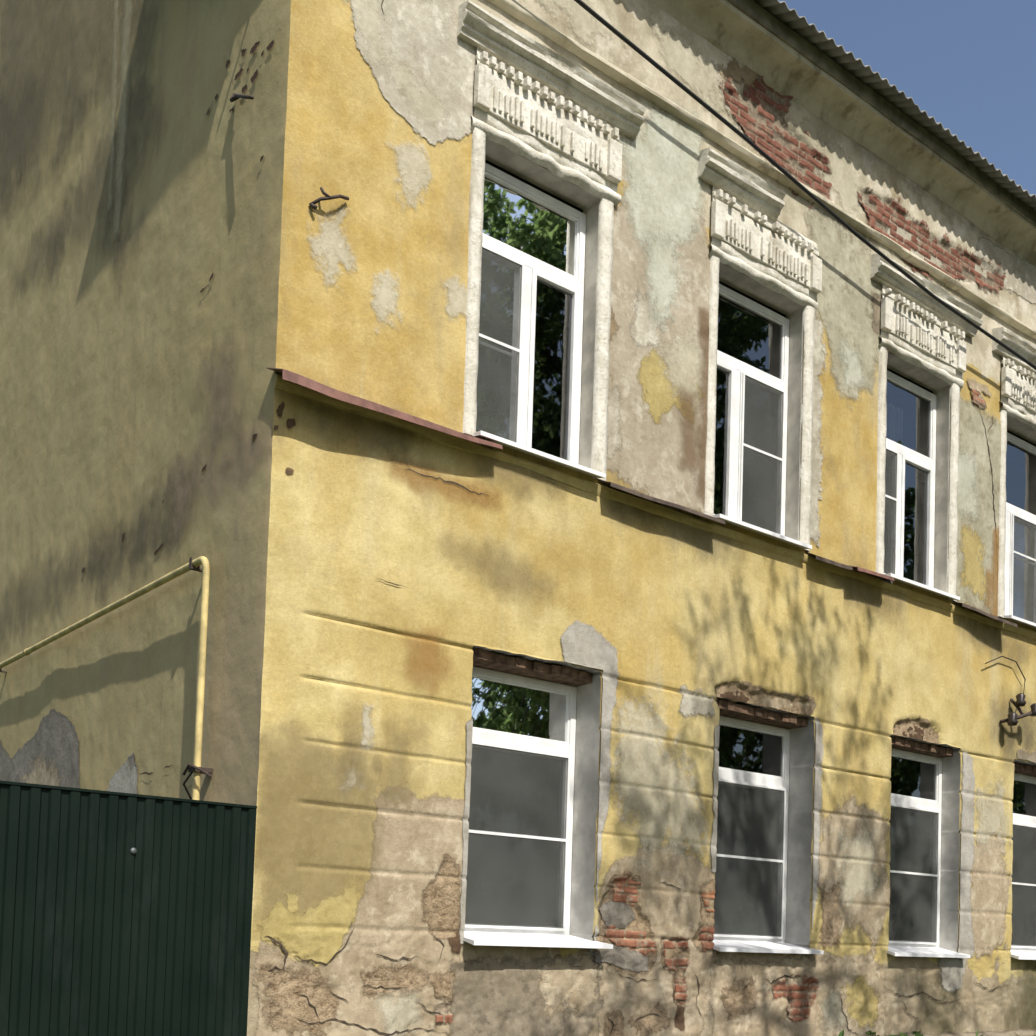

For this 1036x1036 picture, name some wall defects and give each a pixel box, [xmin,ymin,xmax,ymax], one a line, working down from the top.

water stain [111,0,130,230]
flaking render [351,0,477,207]
flaking render [540,0,613,43]
flaking render [309,208,356,283]
flaking render [607,196,711,515]
flaking render [652,24,1036,547]
flaking render [0,709,80,788]
crack [264,926,355,972]
flaking render [253,718,473,1036]
crack [295,985,448,1036]
crack [377,937,444,963]
flaking render [538,681,891,1036]